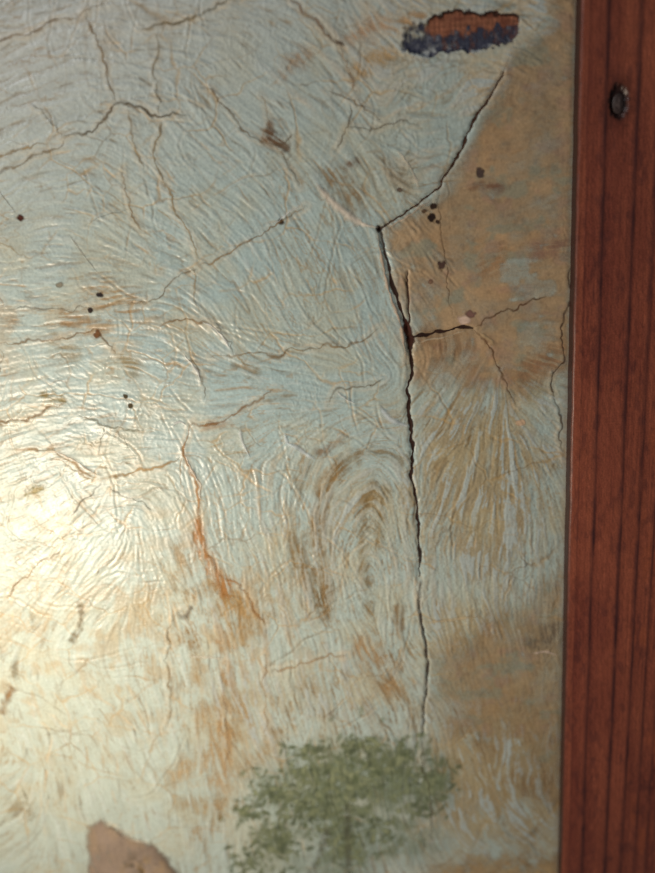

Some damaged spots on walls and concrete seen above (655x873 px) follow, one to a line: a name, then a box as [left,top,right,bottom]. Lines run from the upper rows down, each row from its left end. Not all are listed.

peeling [402,9,519,58]
crack [550,280,570,392]
crack [378,71,540,733]